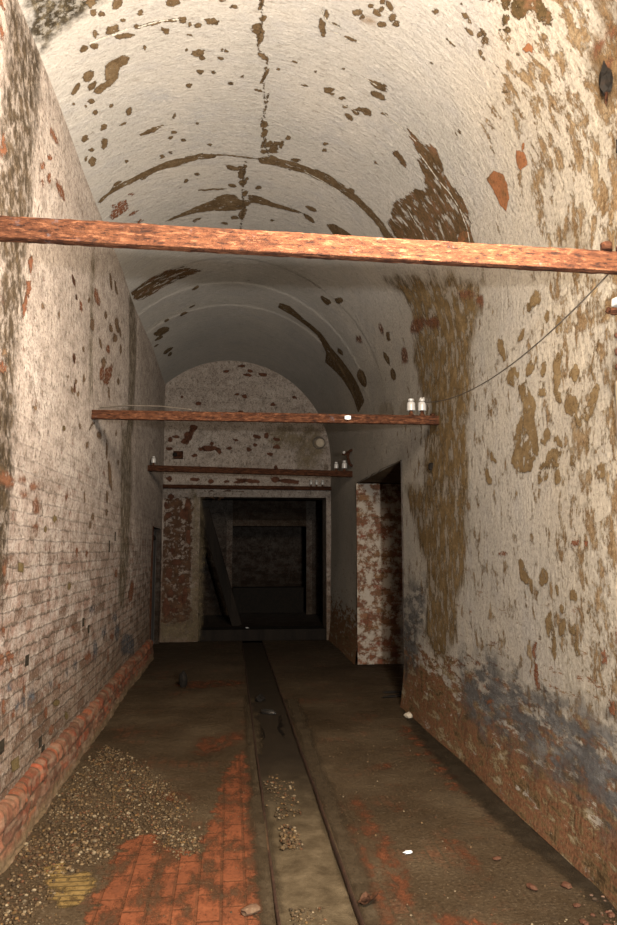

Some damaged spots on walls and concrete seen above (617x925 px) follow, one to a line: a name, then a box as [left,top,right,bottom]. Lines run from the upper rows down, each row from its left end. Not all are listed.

leakage [0,0,98,217]
peeling [71,55,130,115]
peeling [86,0,123,17]
peeling [80,9,220,53]
crack [98,0,391,238]
peeling [252,0,280,92]
spalling [486,171,509,211]
leakage [587,0,617,102]
leakage [0,242,27,597]
peeling [497,339,600,485]
leakage [462,656,617,815]
leakage [408,718,617,913]